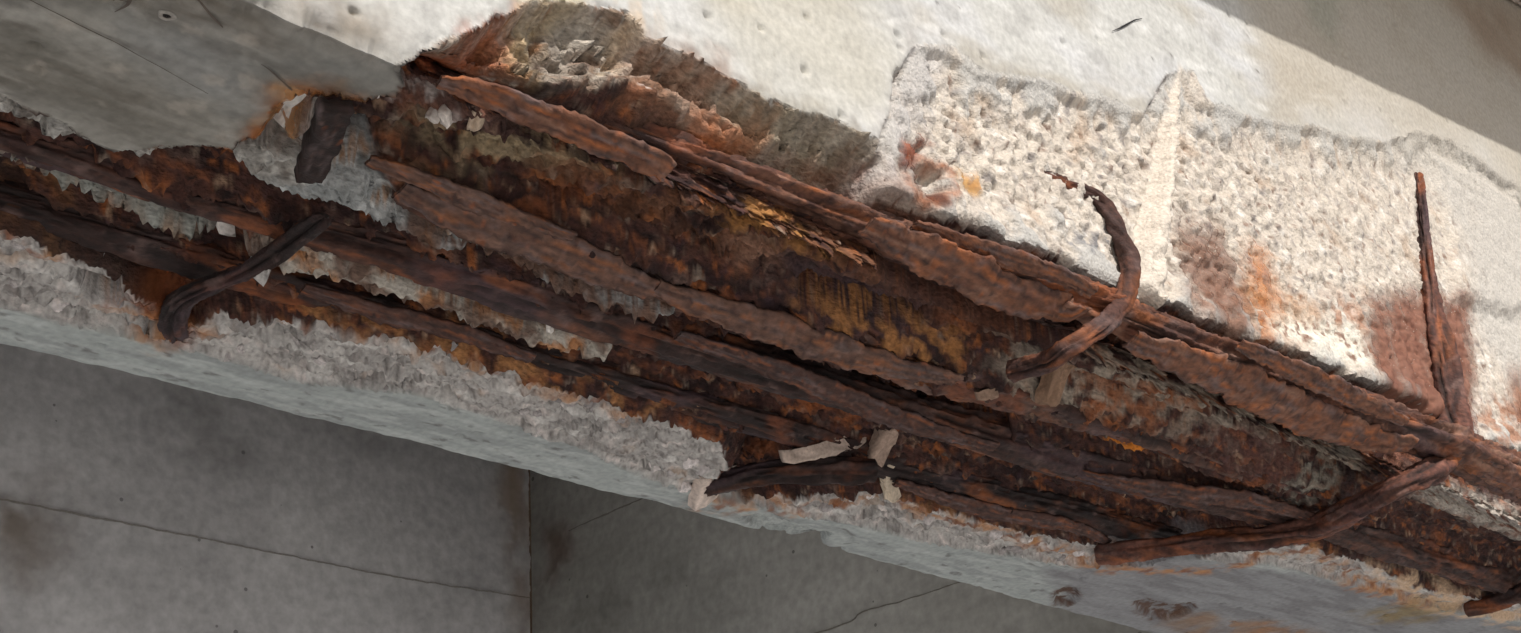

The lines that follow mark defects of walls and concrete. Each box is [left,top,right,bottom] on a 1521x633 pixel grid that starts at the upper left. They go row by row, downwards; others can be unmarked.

corrosion [435,75,677,182]
corrosion [902,139,924,181]
corrosion [364,155,1000,451]
spalling [0,48,1422,534]
corrosion [857,217,1099,322]
corrosion [1122,236,1445,465]
corrosion [1444,300,1474,422]
spalling [734,477,1101,569]
corrosion [1073,469,1316,521]
spalling [1353,473,1521,573]
spalling [1053,586,1083,607]
spalling [1116,539,1521,622]